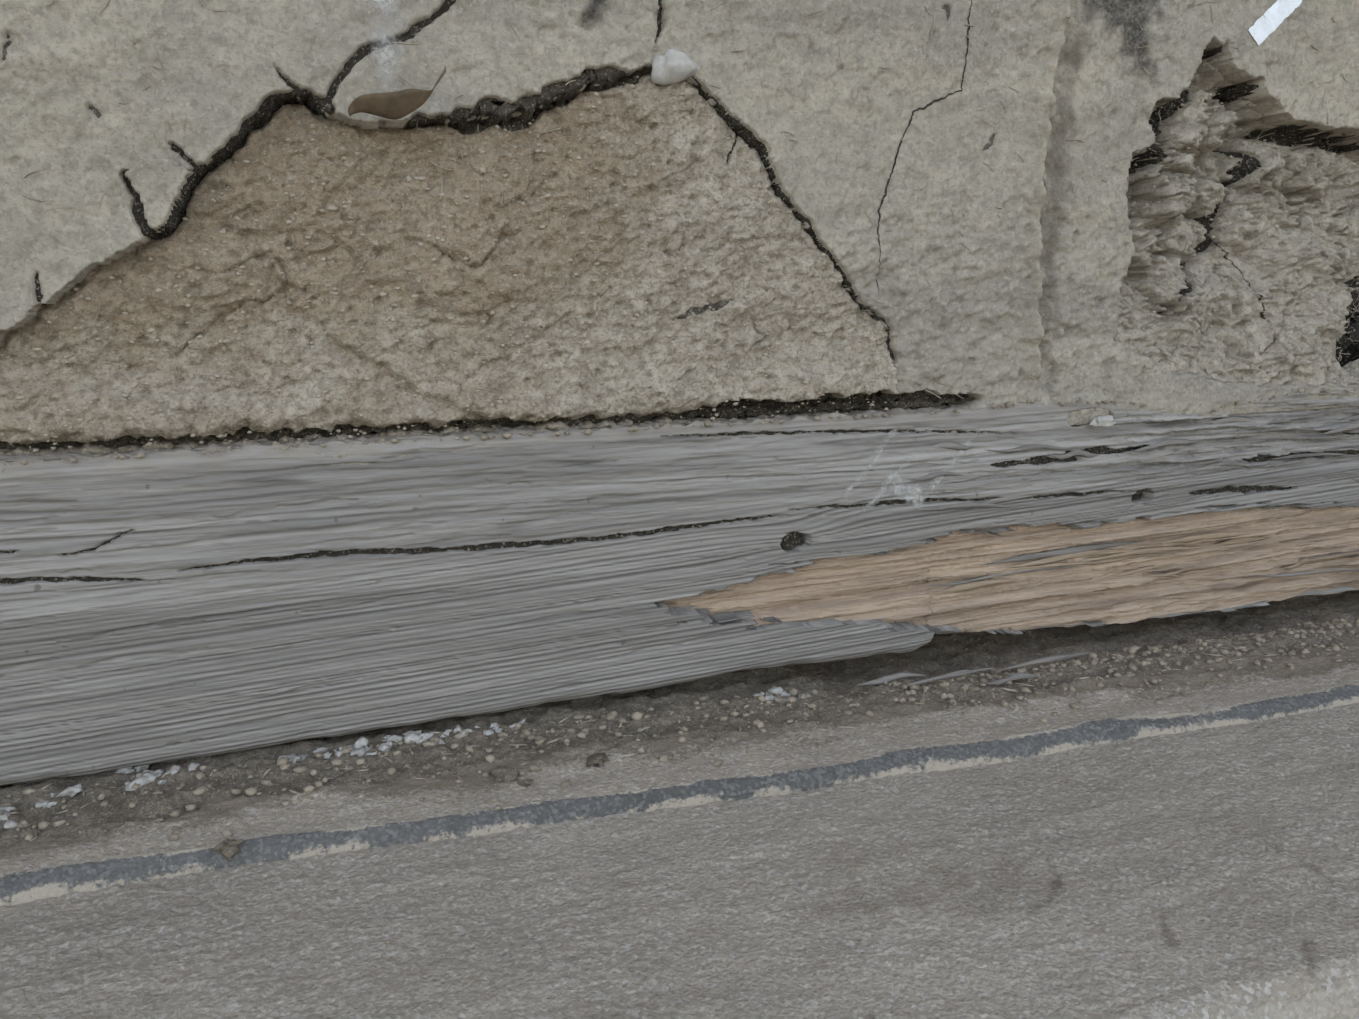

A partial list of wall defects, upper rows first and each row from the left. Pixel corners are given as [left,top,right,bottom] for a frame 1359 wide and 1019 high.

spalling [2,33,12,61]
crack [654,0,662,43]
damp [1091,0,1160,69]
crack [1202,46,1222,60]
crack [123,0,456,240]
crack [1129,82,1259,175]
spalling [0,48,975,456]
crack [691,0,972,360]
spalling [1114,57,1359,387]
crack [1157,124,1359,323]
crack [1336,271,1359,353]